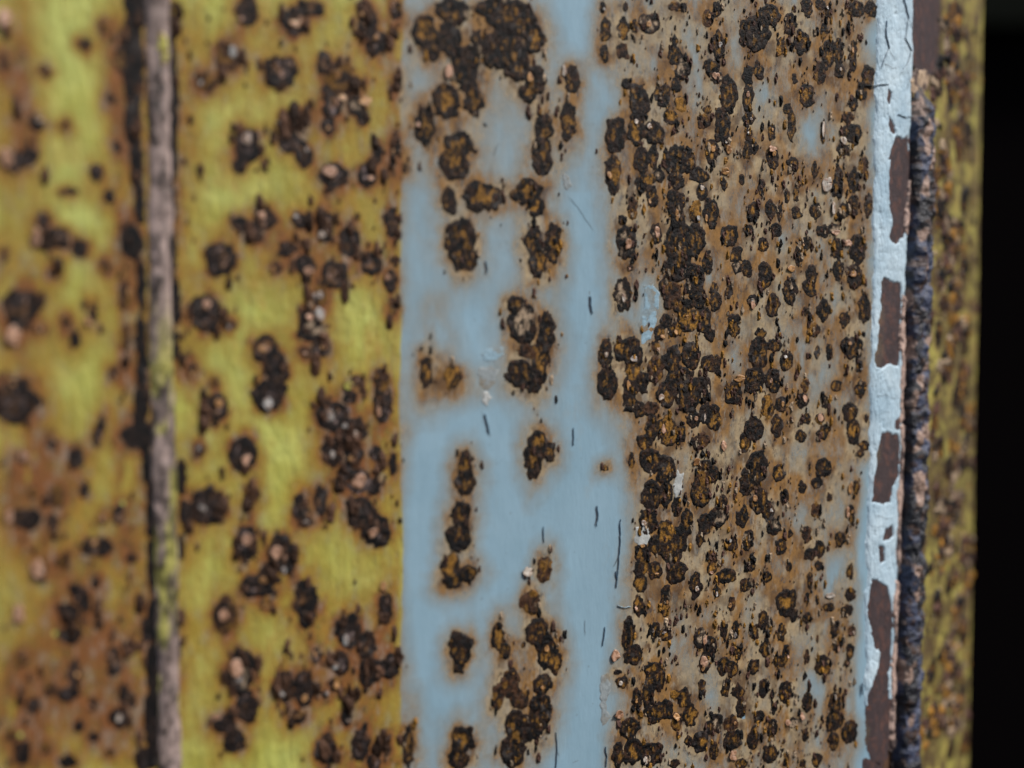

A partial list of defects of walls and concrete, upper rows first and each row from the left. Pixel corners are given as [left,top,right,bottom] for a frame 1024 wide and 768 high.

corrosion [0,0,587,768]
corrosion [592,0,877,768]
peeling [862,278,908,768]
peeling [888,117,912,244]
corrosion [919,0,983,761]